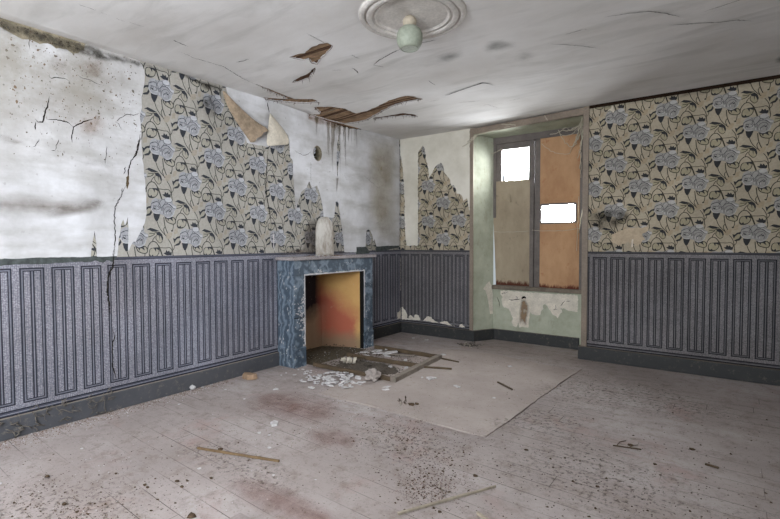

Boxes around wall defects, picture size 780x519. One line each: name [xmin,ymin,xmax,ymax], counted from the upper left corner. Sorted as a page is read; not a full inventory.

damp [3,24,94,104]
flaking render [0,18,121,60]
crack [33,77,100,151]
damp [53,59,141,132]
crack [608,0,745,25]
crack [106,139,140,377]
flaking render [397,307,464,327]
flaking render [483,281,578,328]